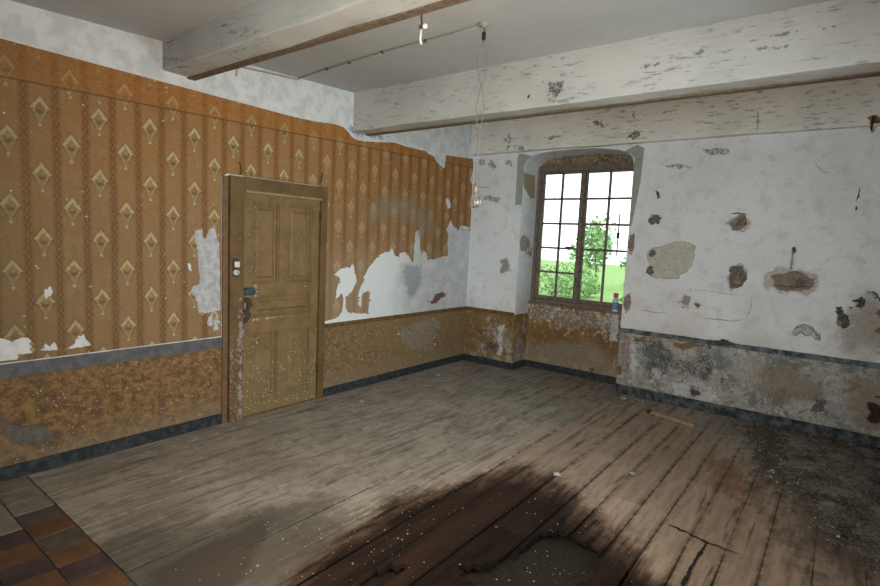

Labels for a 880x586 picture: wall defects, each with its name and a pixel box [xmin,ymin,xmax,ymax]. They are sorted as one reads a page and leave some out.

spalling [728,214,750,232]
spalling [646,241,695,279]
spalling [727,263,747,290]
spalling [764,267,818,295]
peeling [849,291,880,309]
leakage [484,324,505,356]
leakage [628,342,724,386]